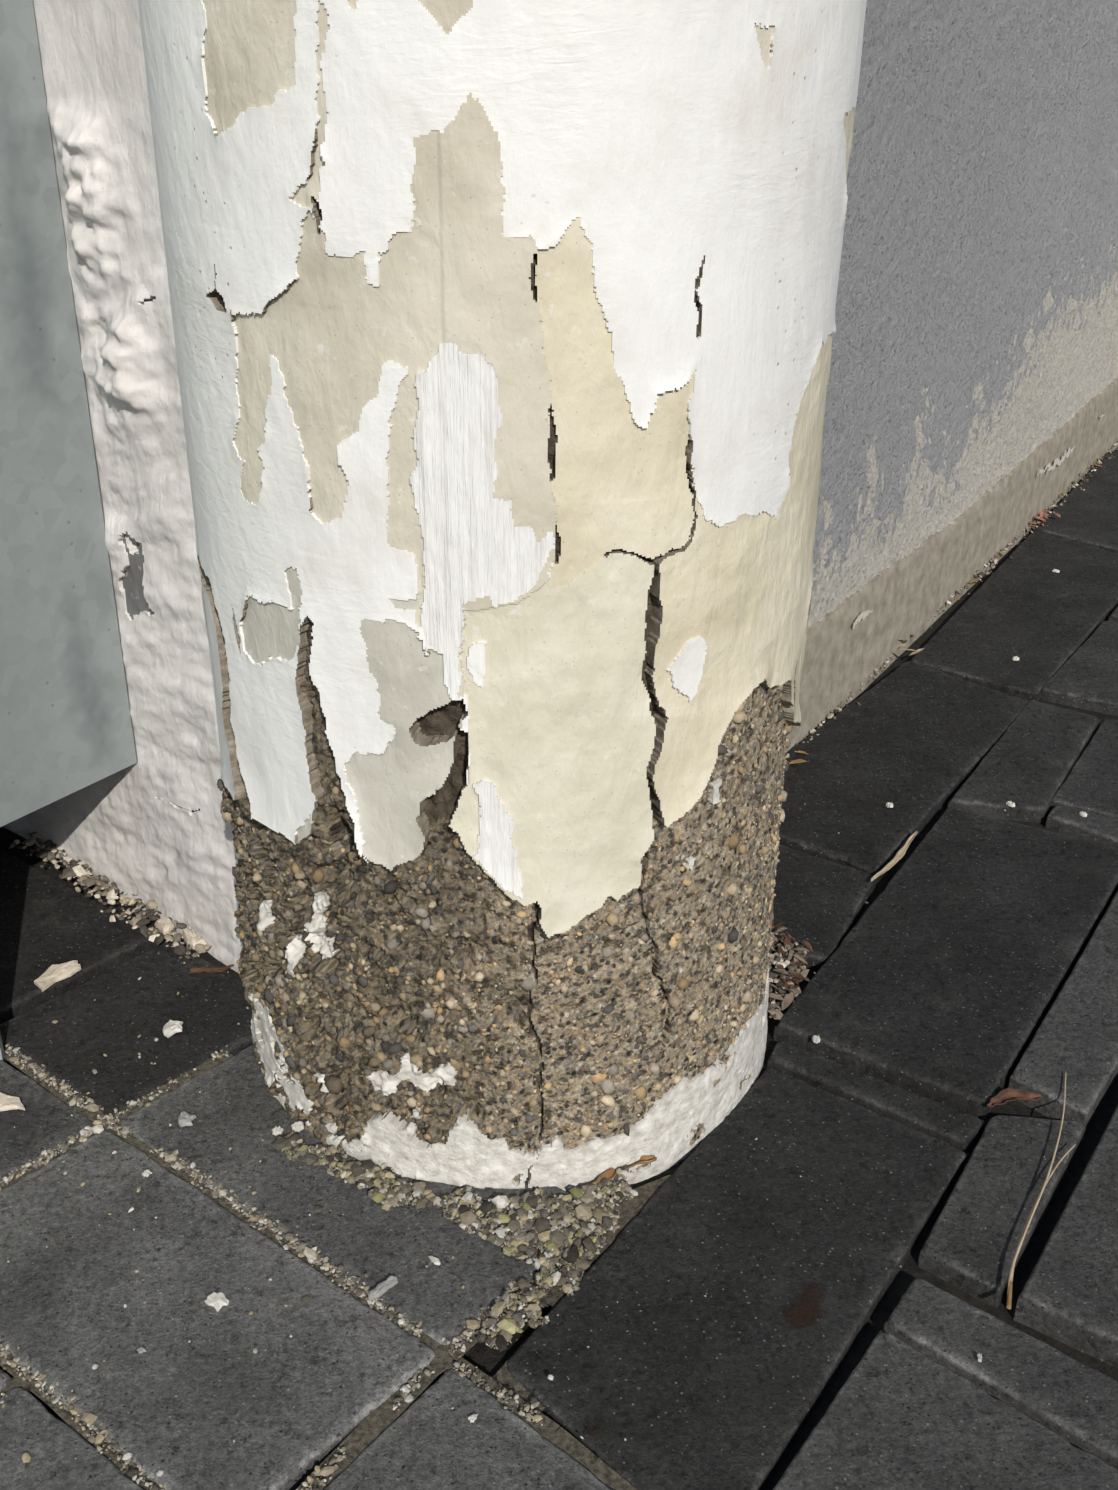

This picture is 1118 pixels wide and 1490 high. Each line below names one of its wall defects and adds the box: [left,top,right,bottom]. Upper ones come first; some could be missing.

peeling [202,0,297,134]
crack [529,254,537,301]
crack [548,406,557,479]
crack [553,525,561,561]
crack [639,555,657,717]
spalling [217,0,1118,1195]
peeling [155,917,207,949]
crack [526,901,543,1179]